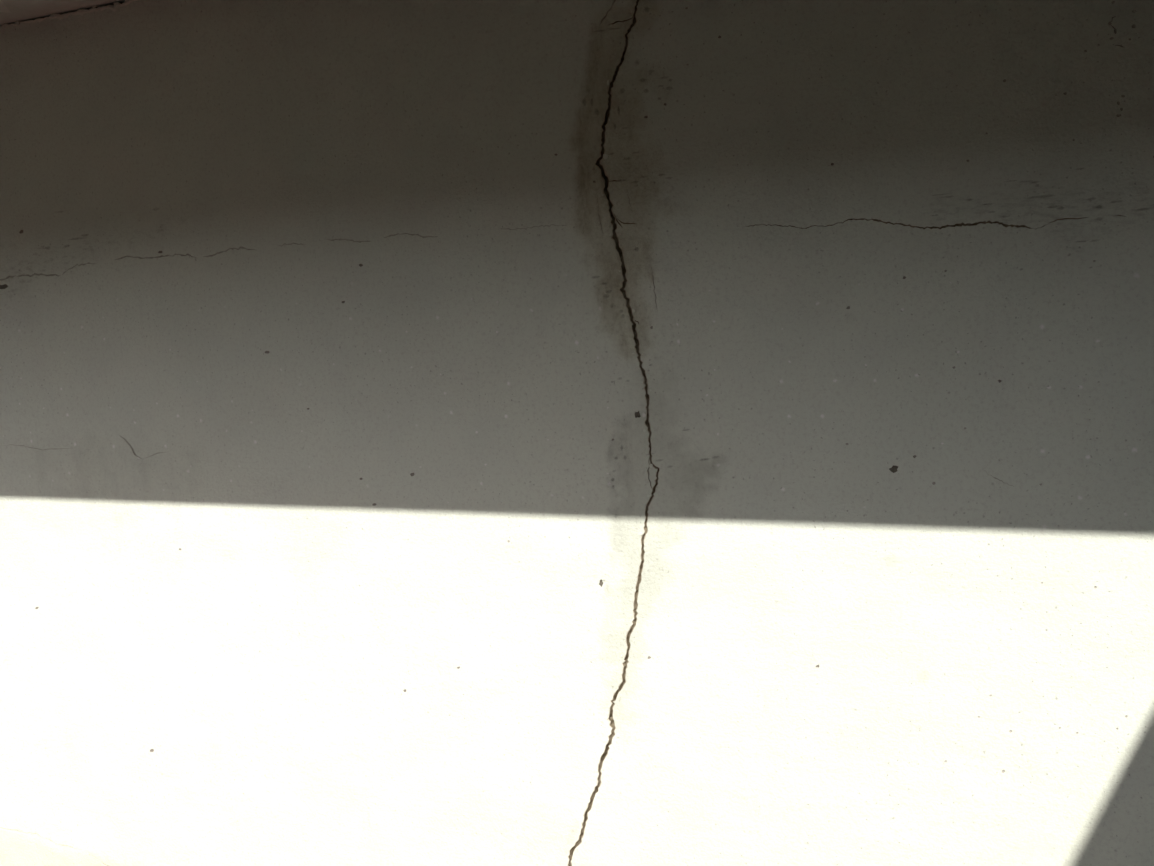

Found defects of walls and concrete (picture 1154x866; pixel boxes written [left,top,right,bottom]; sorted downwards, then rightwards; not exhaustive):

crack [748,217,1088,229]
crack [0,233,438,280]
crack [567,0,660,866]